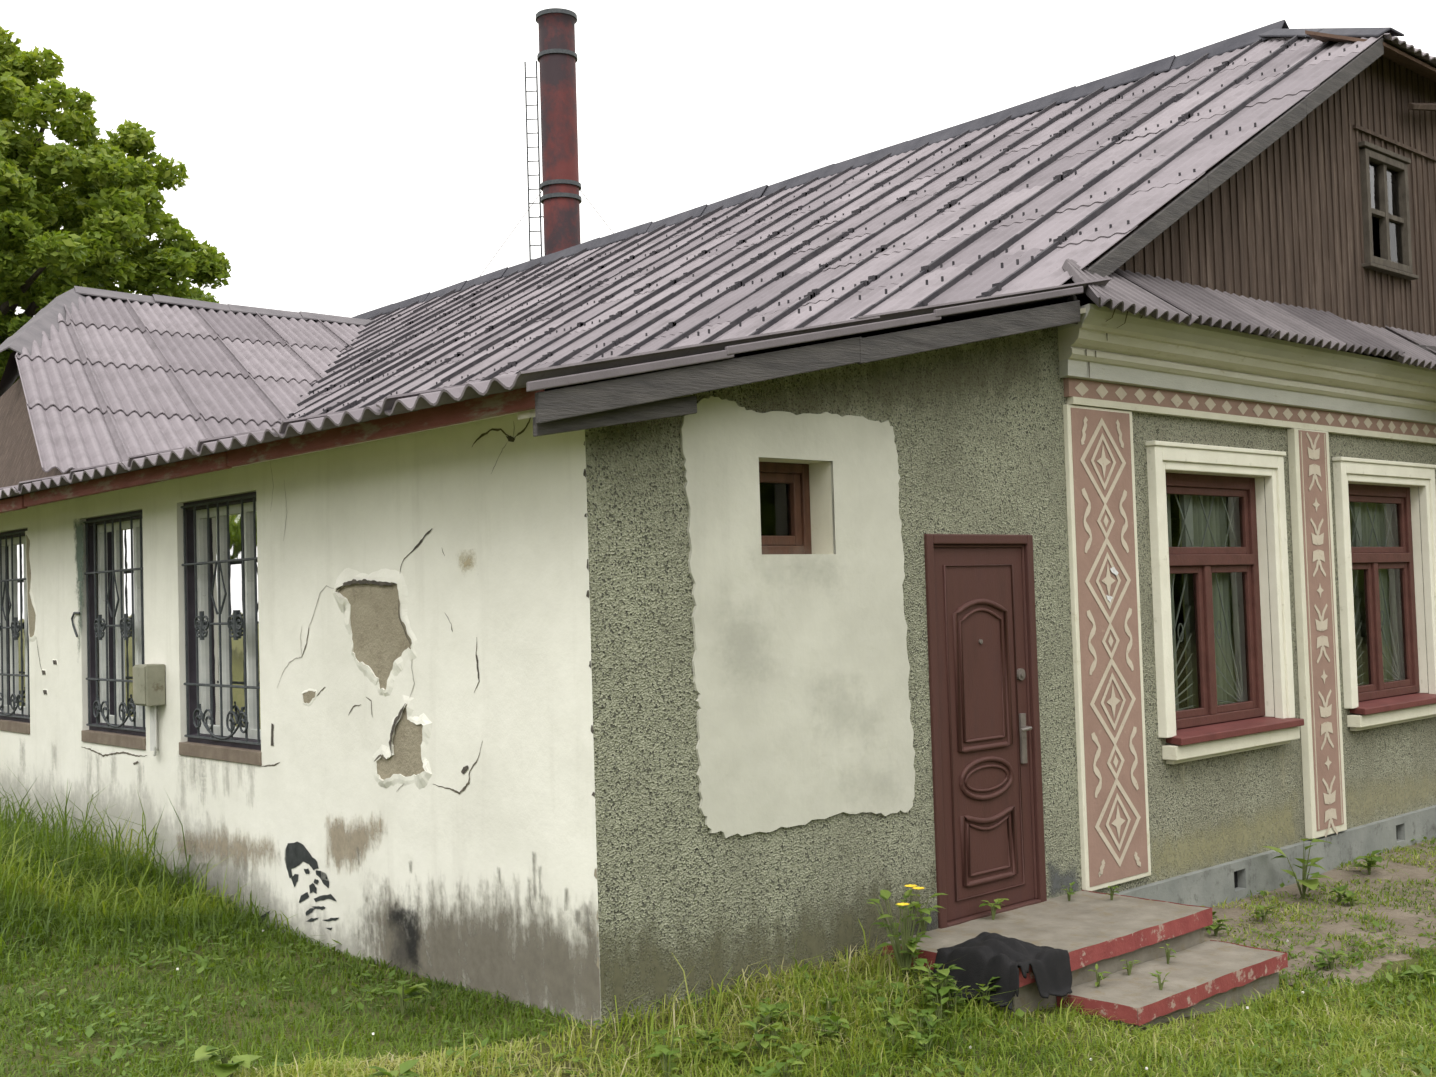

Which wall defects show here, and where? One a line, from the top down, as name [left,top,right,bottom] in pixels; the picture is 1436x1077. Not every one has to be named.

crack [472,418,531,471]
crack [400,529,445,571]
crack [277,585,334,687]
flaking render [333,568,432,790]
crack [396,744,482,795]
damp [370,883,938,1030]